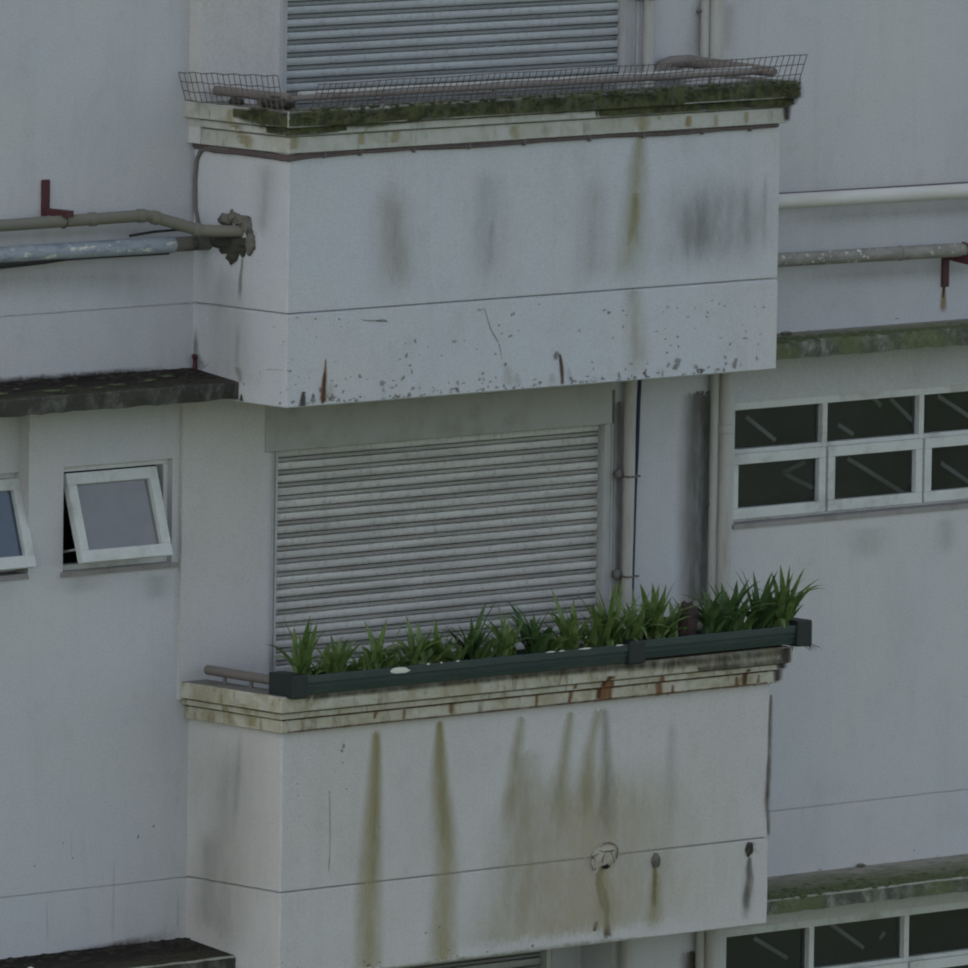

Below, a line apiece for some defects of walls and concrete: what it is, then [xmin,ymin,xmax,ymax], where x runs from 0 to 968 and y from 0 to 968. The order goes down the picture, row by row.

rust [554,352,564,384]
rust [282,669,776,967]